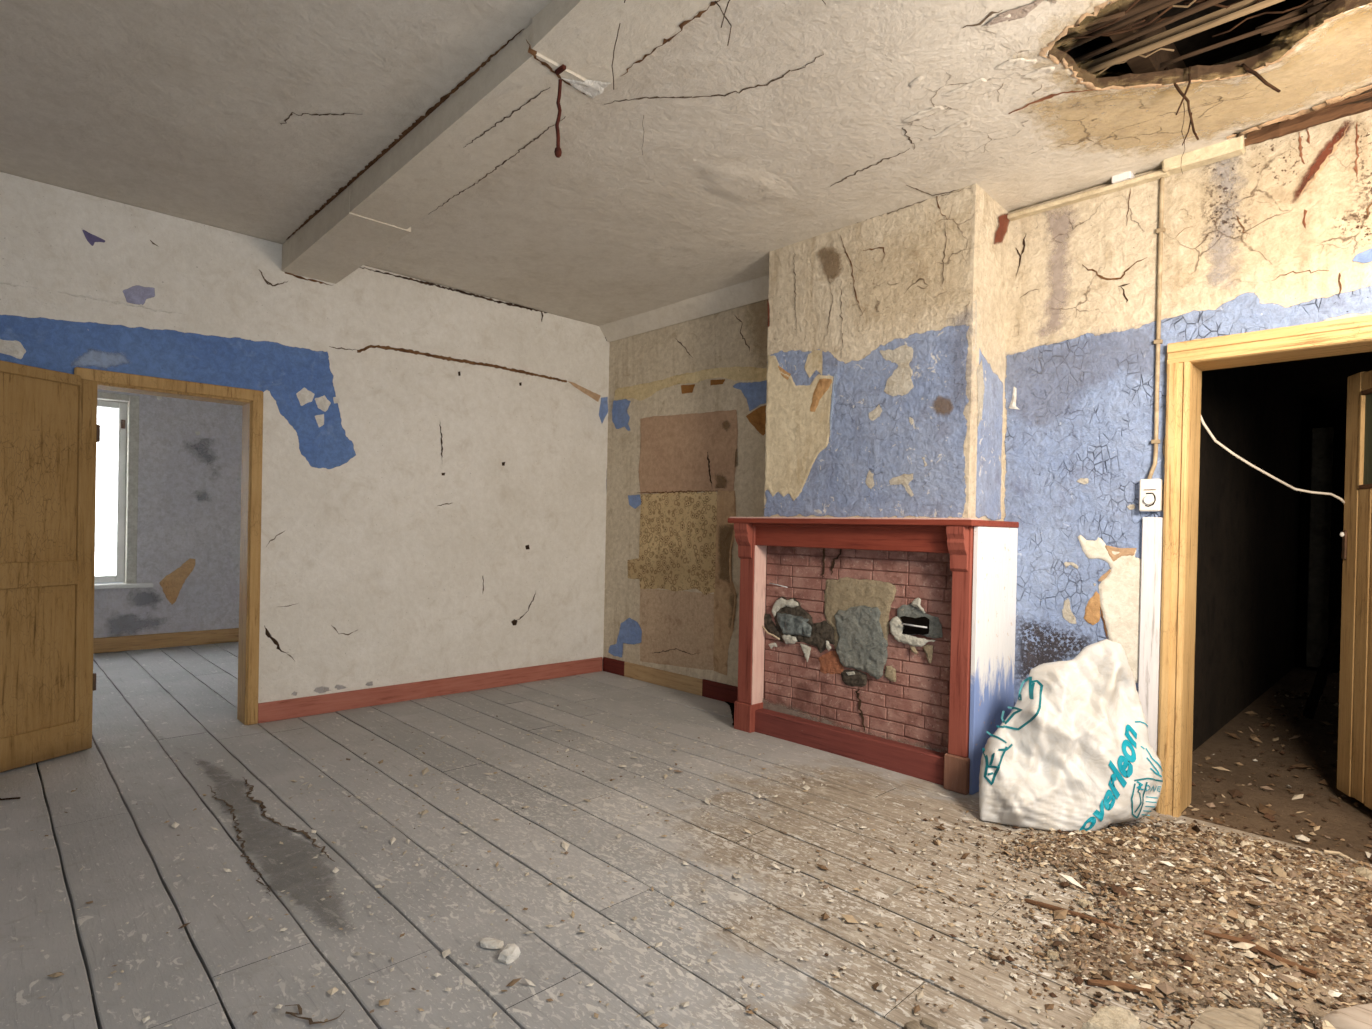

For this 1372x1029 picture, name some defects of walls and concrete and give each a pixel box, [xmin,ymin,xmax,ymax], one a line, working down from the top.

crack [259,0,824,286]
water stain [1009,89,1094,114]
rust [1295,121,1360,228]
crack [360,267,558,321]
crack [1069,257,1147,310]
peeling [0,315,356,469]
crack [329,345,601,402]
peeling [599,397,631,431]
peeling [681,286,1372,706]
water stain [1019,623,1087,678]
water stain [207,777,335,896]
peeling [278,714,1045,1028]